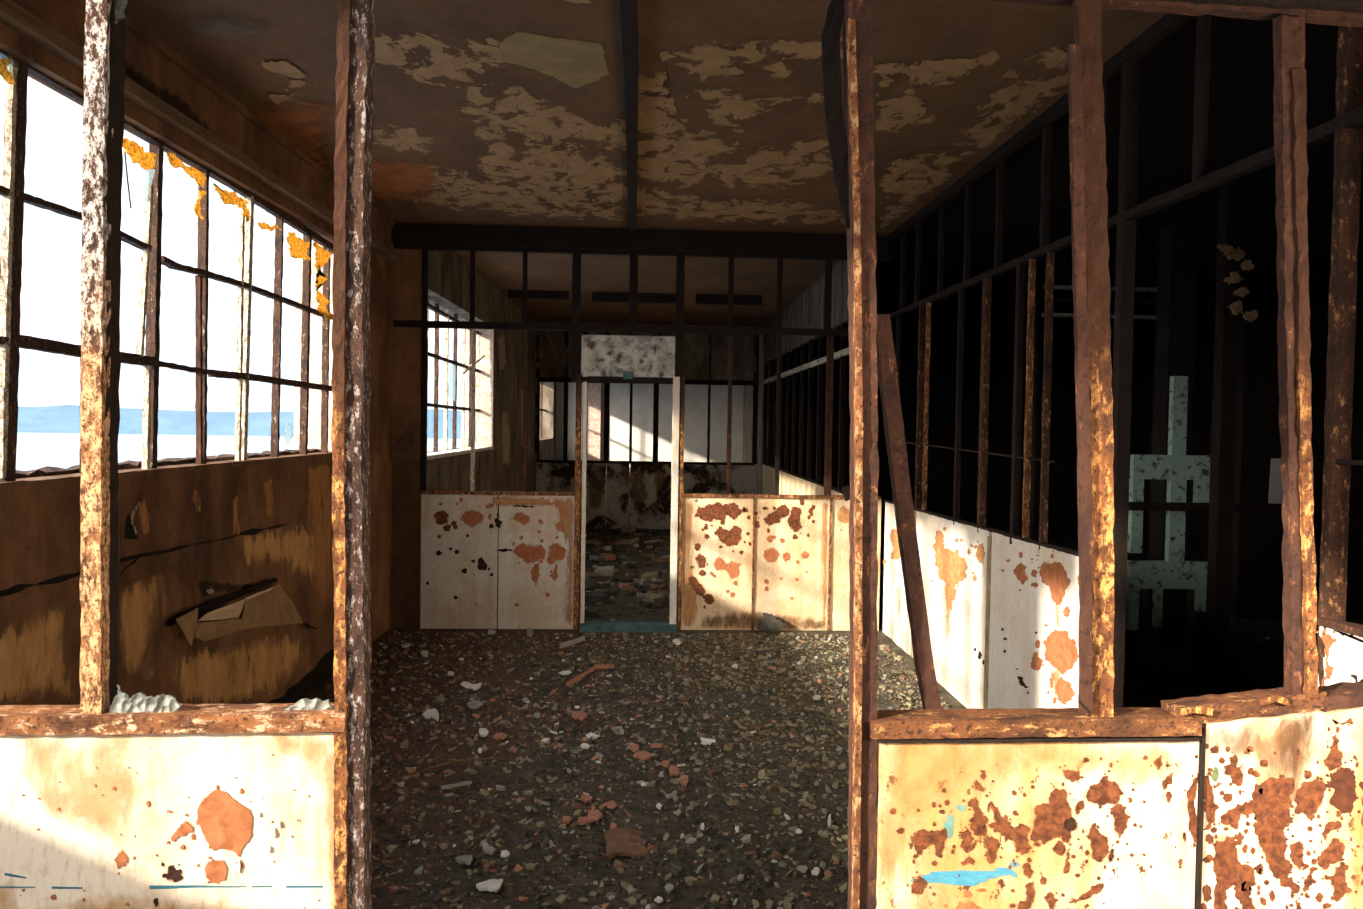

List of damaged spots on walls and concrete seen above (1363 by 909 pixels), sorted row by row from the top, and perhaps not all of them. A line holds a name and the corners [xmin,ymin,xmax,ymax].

peeling [373,24,844,226]
crack [0,571,80,597]
crack [118,524,286,578]
rust [429,497,573,621]
rust [683,497,849,629]
rust [930,527,985,635]
rust [1001,550,1079,705]
rust [155,777,263,884]
rust [889,716,1363,909]